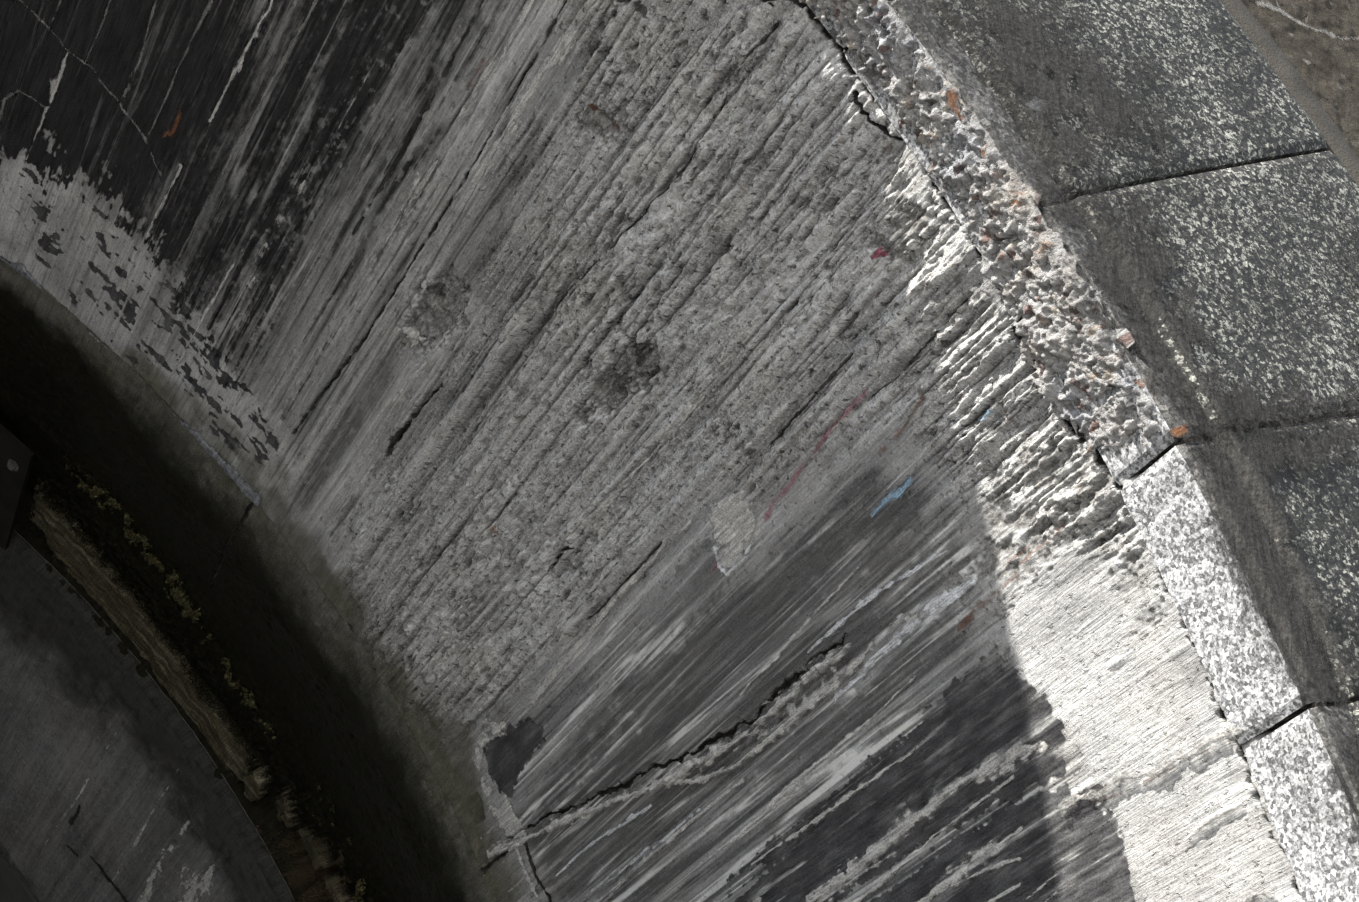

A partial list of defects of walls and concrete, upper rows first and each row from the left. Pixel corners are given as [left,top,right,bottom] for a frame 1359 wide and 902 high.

crack [762,0,903,140]
crack [931,178,982,258]
crack [1012,314,1035,362]
peeling [172,412,260,506]
crack [1062,419,1123,492]
water stain [0,530,295,902]
peeling [472,703,530,841]
crack [481,633,850,902]
crack [1219,705,1260,797]